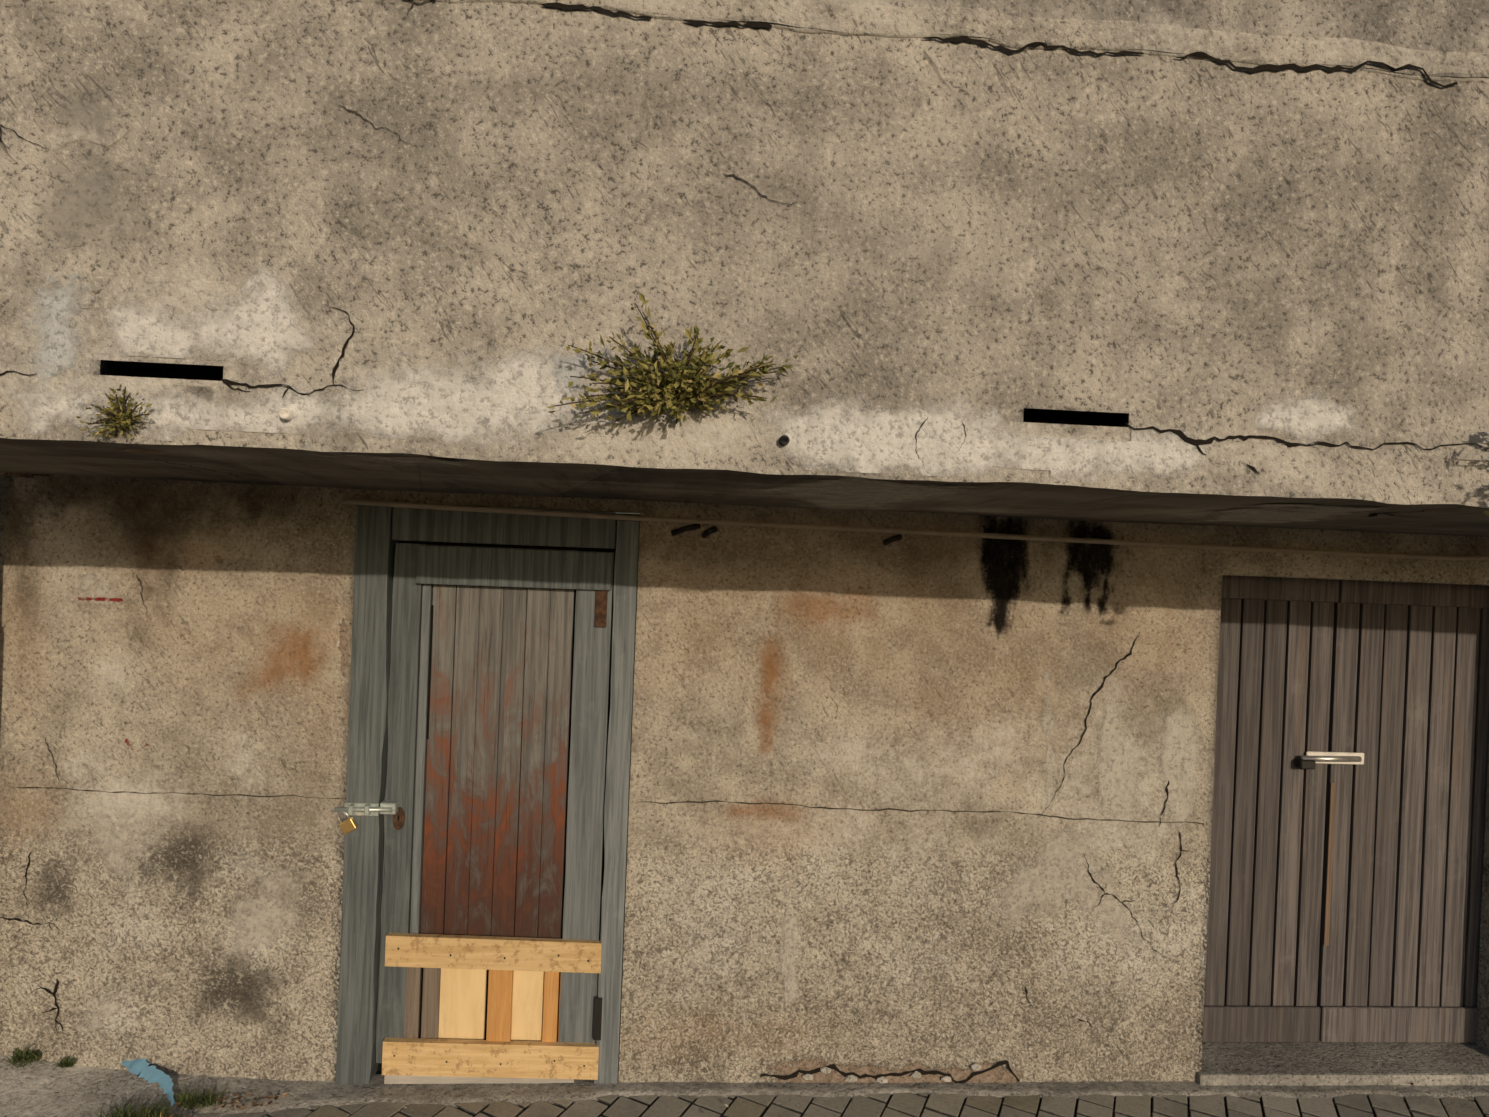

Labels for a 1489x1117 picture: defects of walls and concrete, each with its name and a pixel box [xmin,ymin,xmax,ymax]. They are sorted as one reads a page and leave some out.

crack [339,105,412,145]
crack [723,173,805,205]
leakage [1255,392,1354,441]
leakage [752,399,1203,510]
leakage [1187,504,1389,523]
leakage [981,516,1030,635]
leakage [1061,521,1115,615]
crack [7,738,339,799]
crack [651,632,1205,959]
crack [0,851,61,931]
crack [31,979,63,1031]
spalling [760,1055,1023,1084]